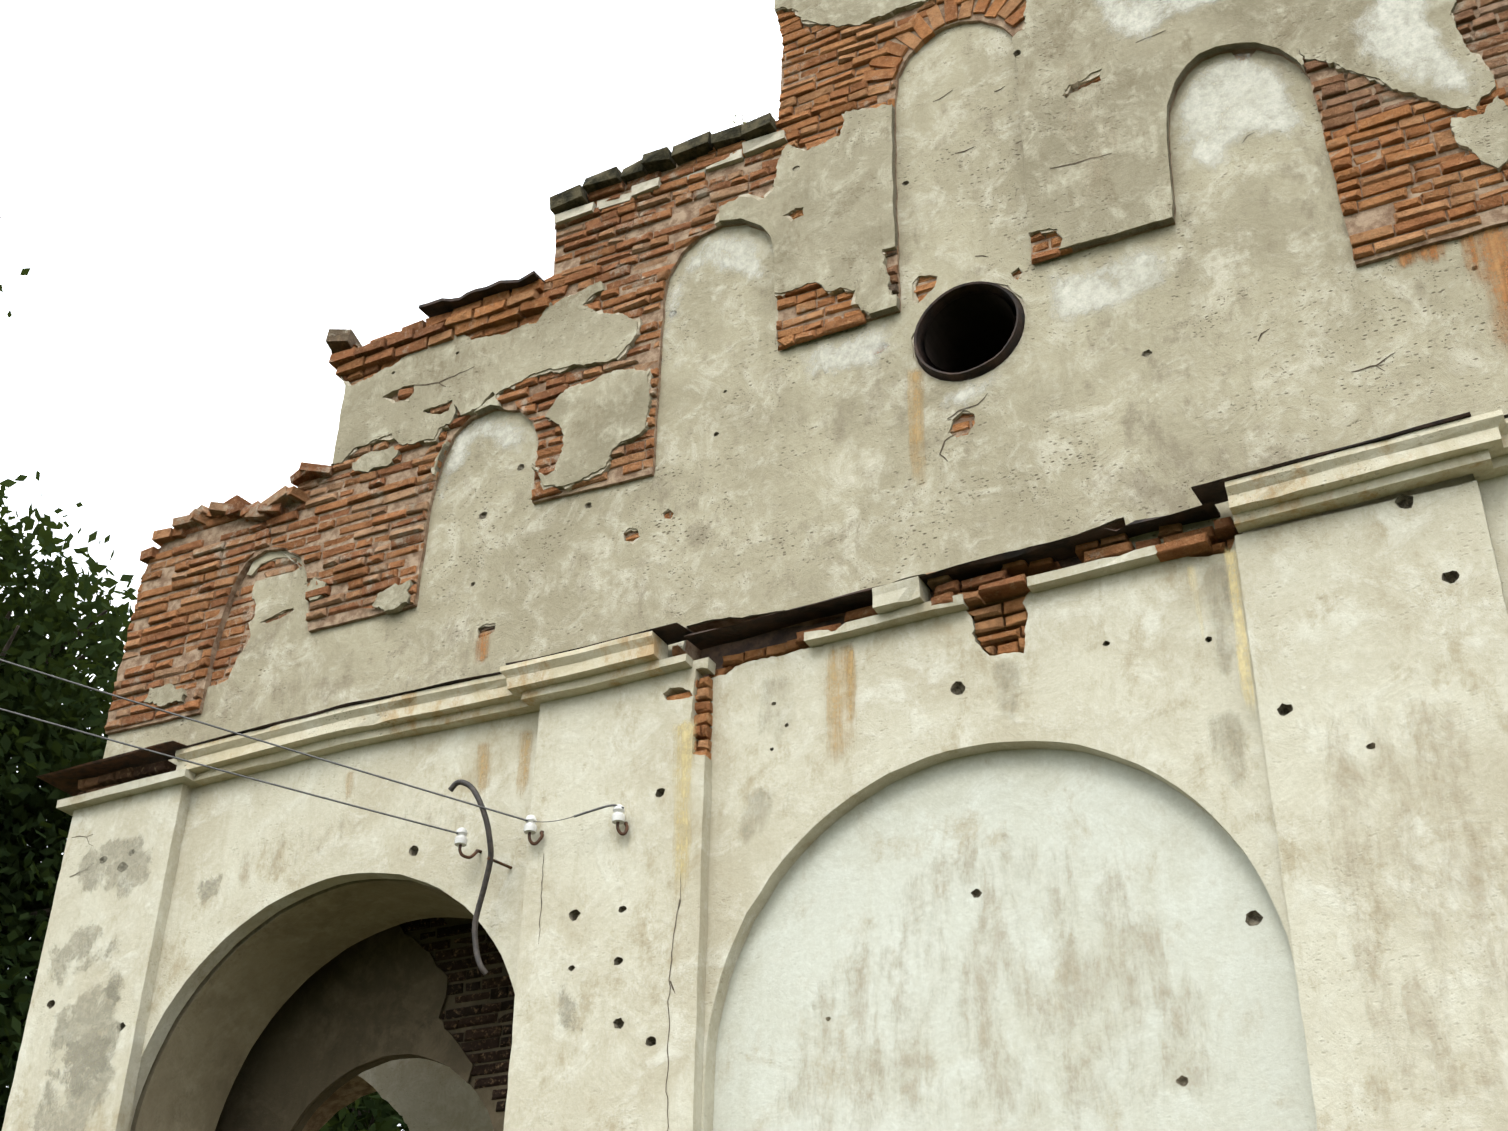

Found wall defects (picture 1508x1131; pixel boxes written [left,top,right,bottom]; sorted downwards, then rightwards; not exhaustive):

spalling [1303,0,1508,260]
spalling [456,0,1026,508]
spalling [1012,232,1073,280]
rust [1397,243,1441,267]
rust [1462,226,1508,340]
spalling [331,331,401,354]
spalling [342,359,414,400]
spalling [104,401,471,731]
flaking render [1075,516,1239,563]
spalling [666,676,713,759]
spalling [951,681,965,695]
spalling [399,917,515,1112]